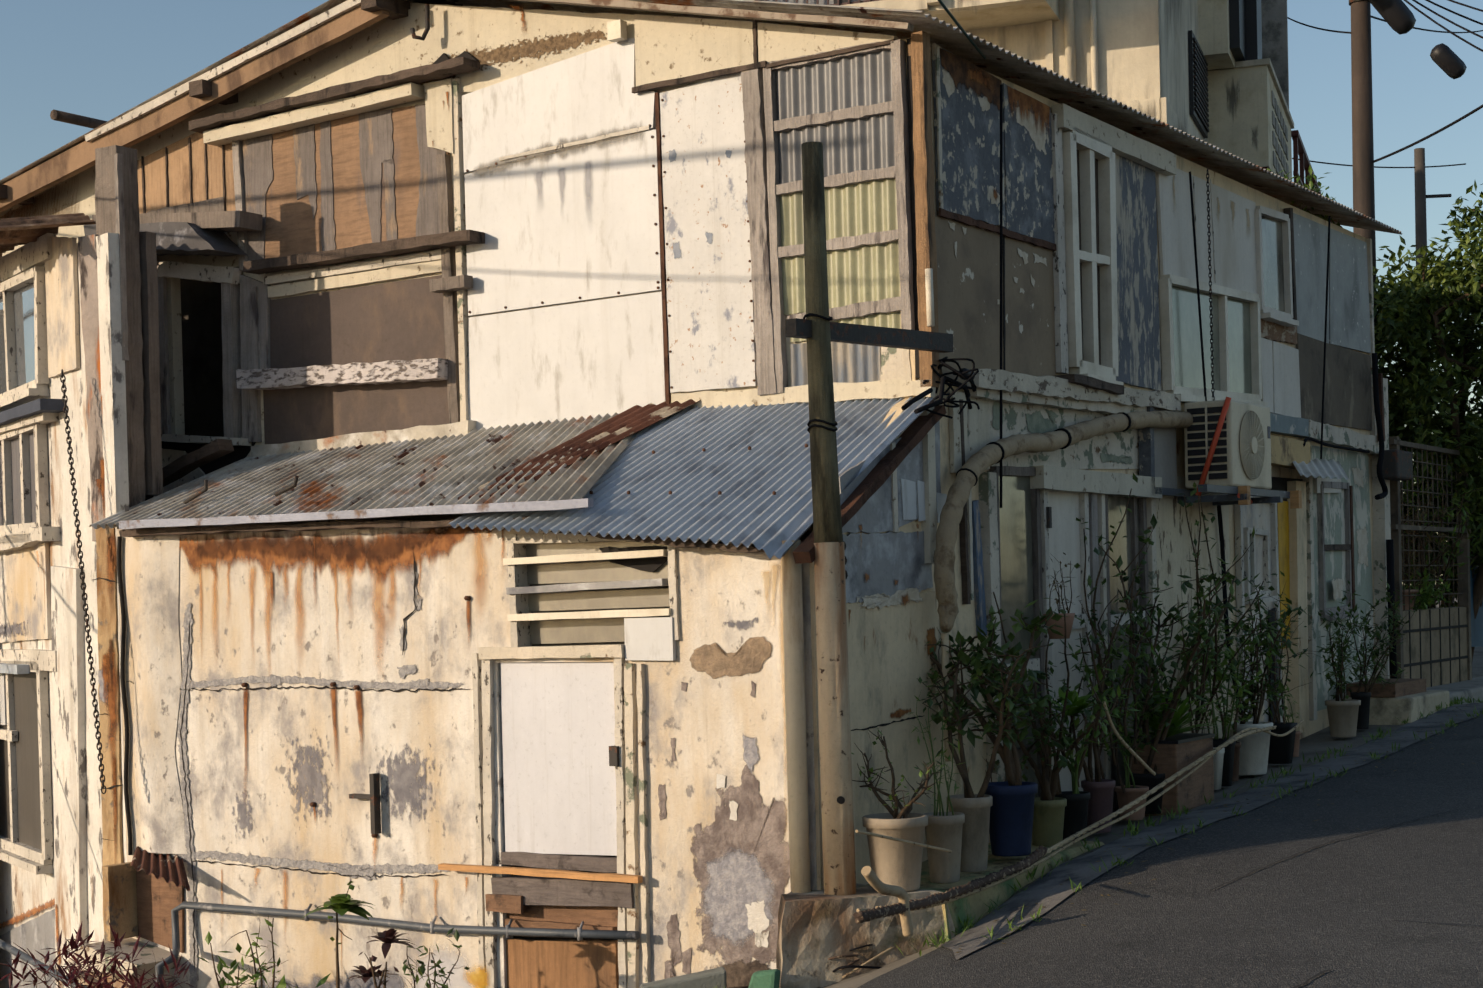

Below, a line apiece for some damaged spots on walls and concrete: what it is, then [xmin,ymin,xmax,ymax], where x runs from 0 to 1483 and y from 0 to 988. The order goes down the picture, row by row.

peeling [942,69,955,97]
peeling [978,96,990,112]
peeling [1016,107,1047,155]
peeling [1022,409,1058,433]
corrosion [458,399,700,504]
peeling [1100,453,1133,464]
corrosion [179,526,505,633]
flaking render [681,617,772,698]
peeling [658,784,667,820]
peeling [664,735,790,988]